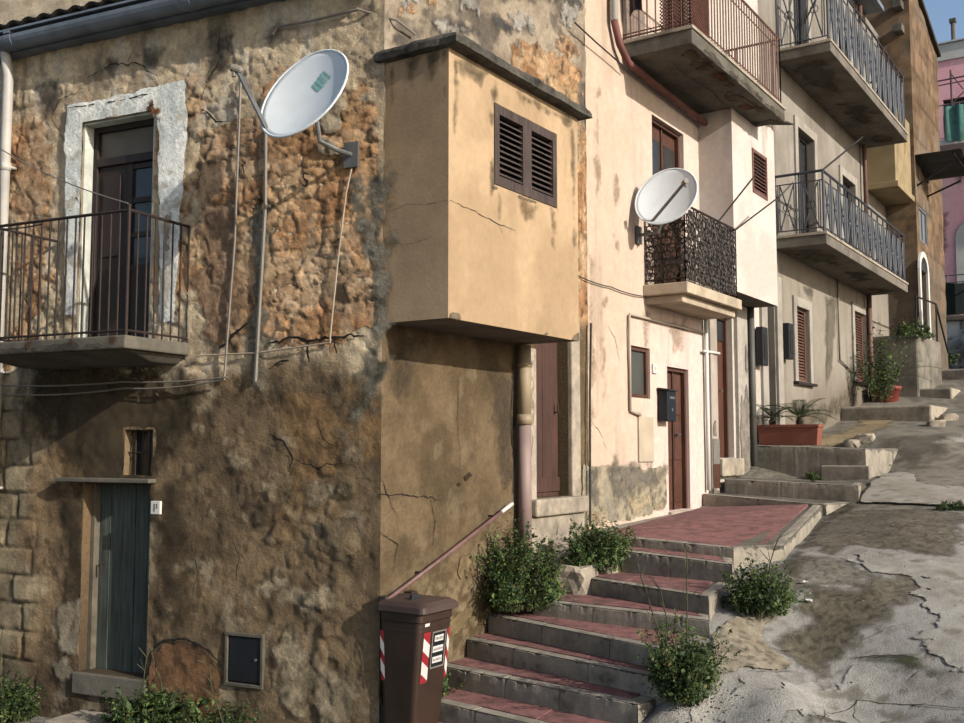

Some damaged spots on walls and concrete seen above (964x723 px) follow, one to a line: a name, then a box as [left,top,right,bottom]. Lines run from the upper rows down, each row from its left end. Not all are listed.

flaking render [434,20,467,34]
flaking render [460,0,480,17]
crack [51,52,161,139]
flaking render [0,80,398,465]
crack [219,323,248,348]
crack [267,333,364,365]
crack [270,422,338,472]
flaking render [260,478,354,508]
flaking render [582,464,667,526]
water stain [610,457,667,498]
flaking render [145,638,223,723]
crack [820,700,959,723]